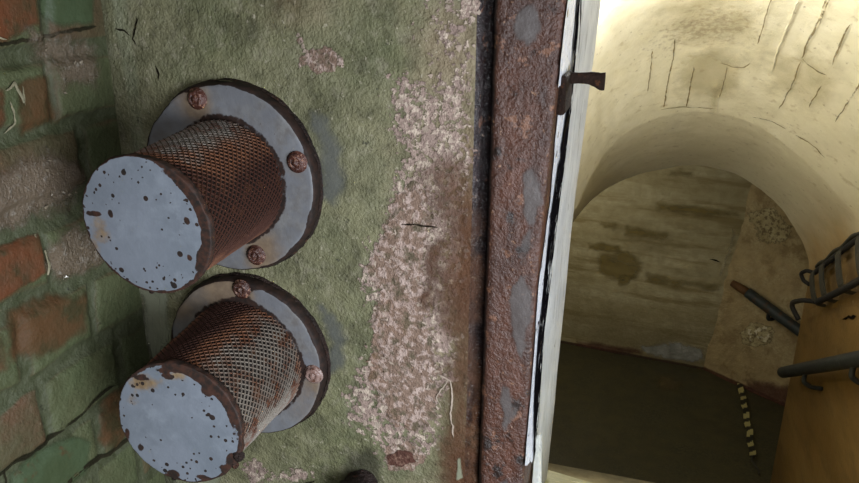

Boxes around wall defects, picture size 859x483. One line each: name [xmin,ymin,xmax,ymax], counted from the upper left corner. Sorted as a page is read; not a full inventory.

peeling [341,0,481,472]
damp [590,243,640,284]
crack [0,385,116,483]
crack [67,439,128,483]